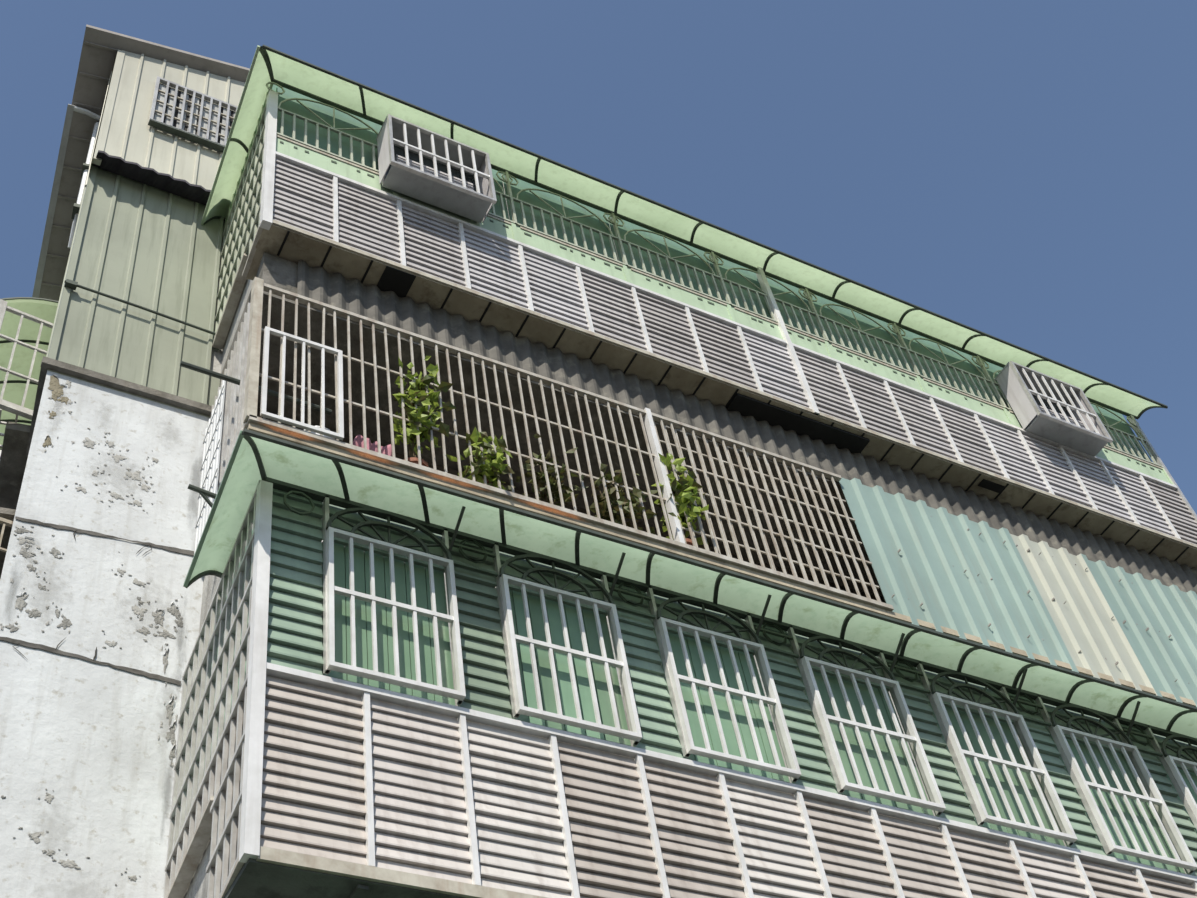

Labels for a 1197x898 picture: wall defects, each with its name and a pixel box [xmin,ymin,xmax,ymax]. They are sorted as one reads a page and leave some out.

peeling [48,374,76,419]
peeling [42,428,158,513]
peeling [0,525,72,633]
peeling [111,551,186,767]